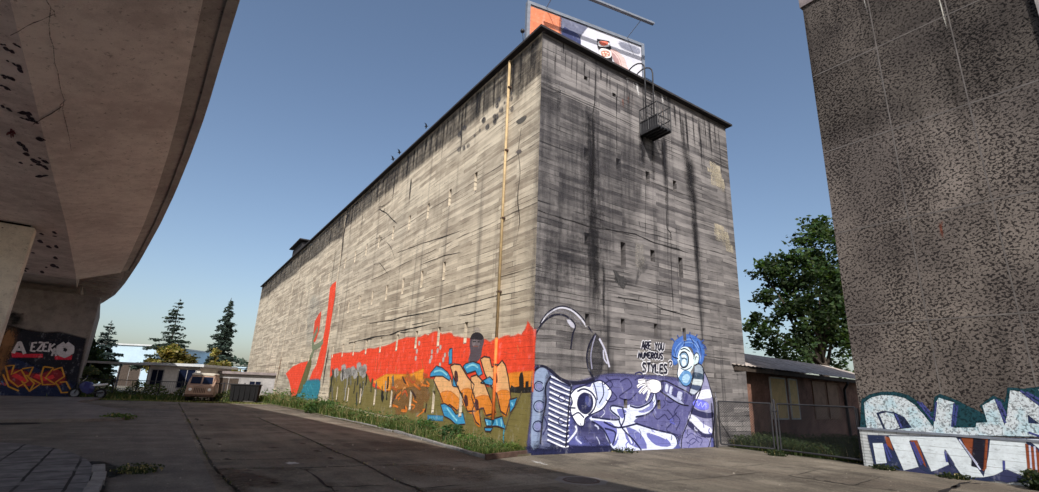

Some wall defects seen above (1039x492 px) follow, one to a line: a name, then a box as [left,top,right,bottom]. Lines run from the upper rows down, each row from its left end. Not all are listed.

crack [10,2,72,151]
leakage [539,99,668,308]
leakage [661,95,725,263]
crack [938,481,986,492]